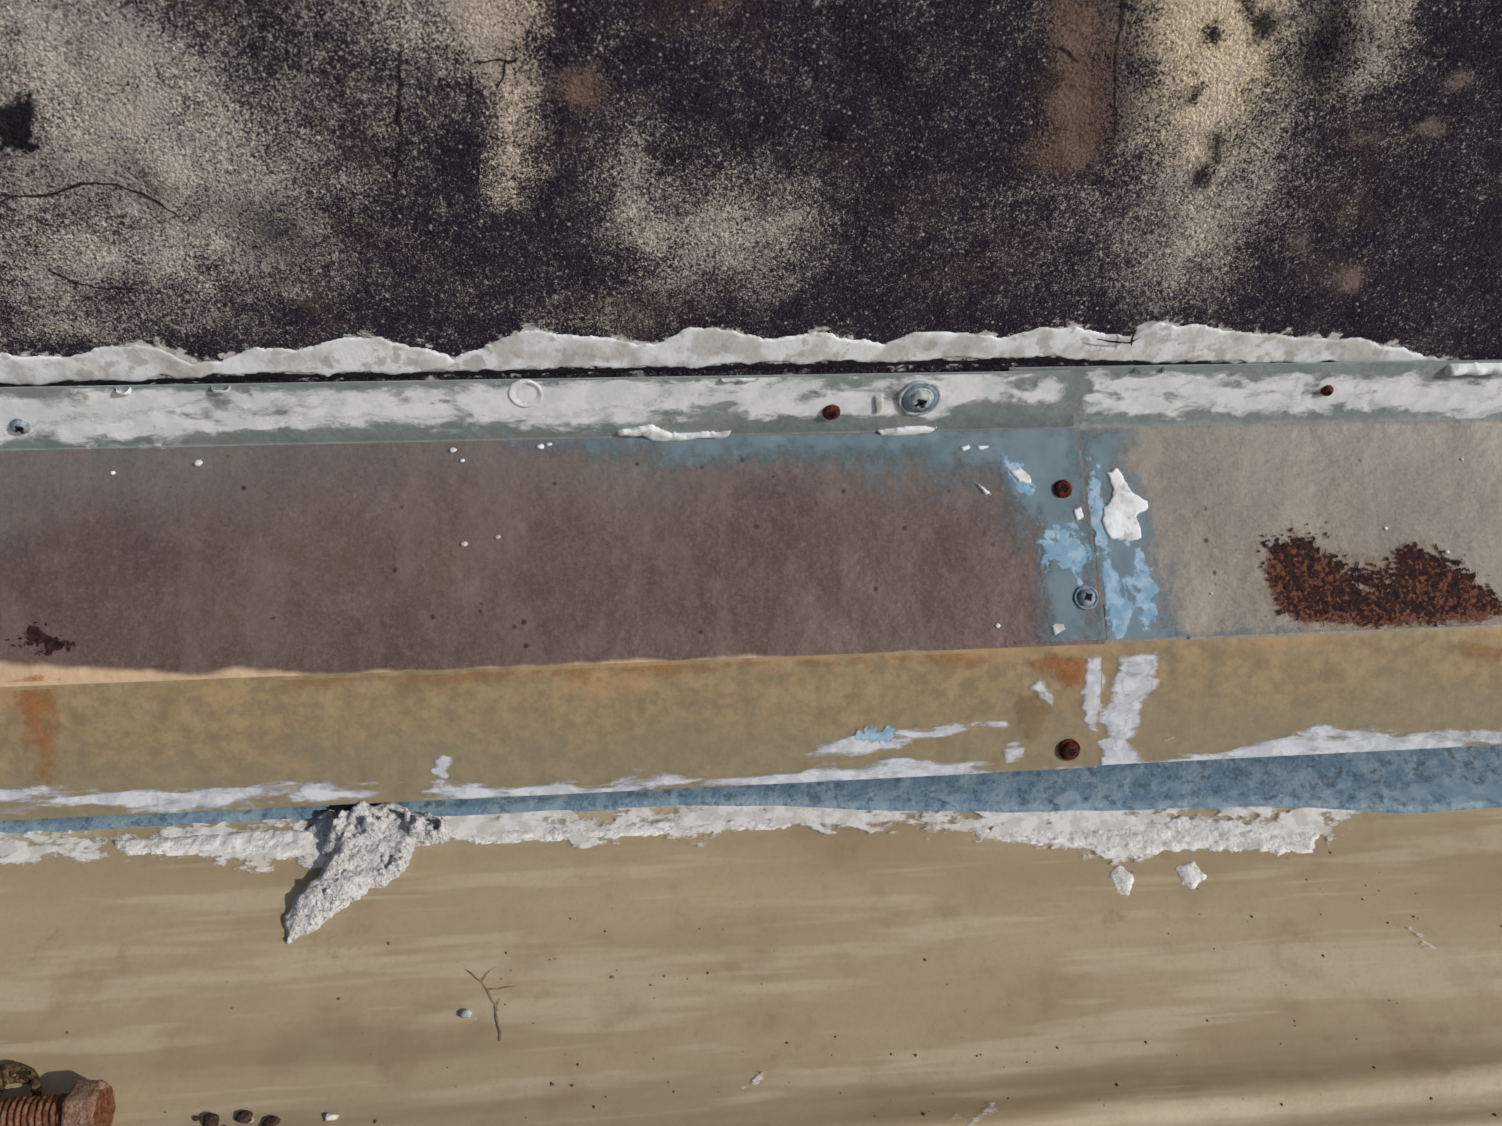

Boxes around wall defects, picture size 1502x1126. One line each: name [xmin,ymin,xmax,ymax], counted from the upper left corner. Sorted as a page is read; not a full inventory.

crack [0,182,186,224]
crack [48,269,136,290]
corrosion [1257,523,1502,630]
corrosion [6,622,75,656]